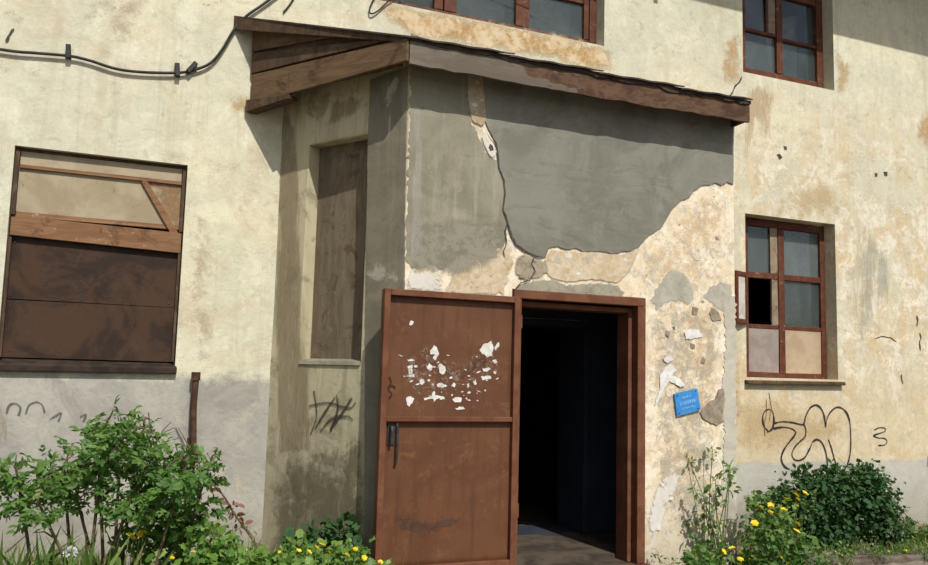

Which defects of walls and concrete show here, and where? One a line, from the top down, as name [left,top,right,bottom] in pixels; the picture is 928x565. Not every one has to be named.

crack [488,131,544,289]
peeling [681,196,700,209]
damp [276,116,323,458]
peeling [446,246,638,295]
spalling [685,301,722,321]
peeling [649,385,678,397]
spalling [699,389,725,425]
damp [275,447,359,551]